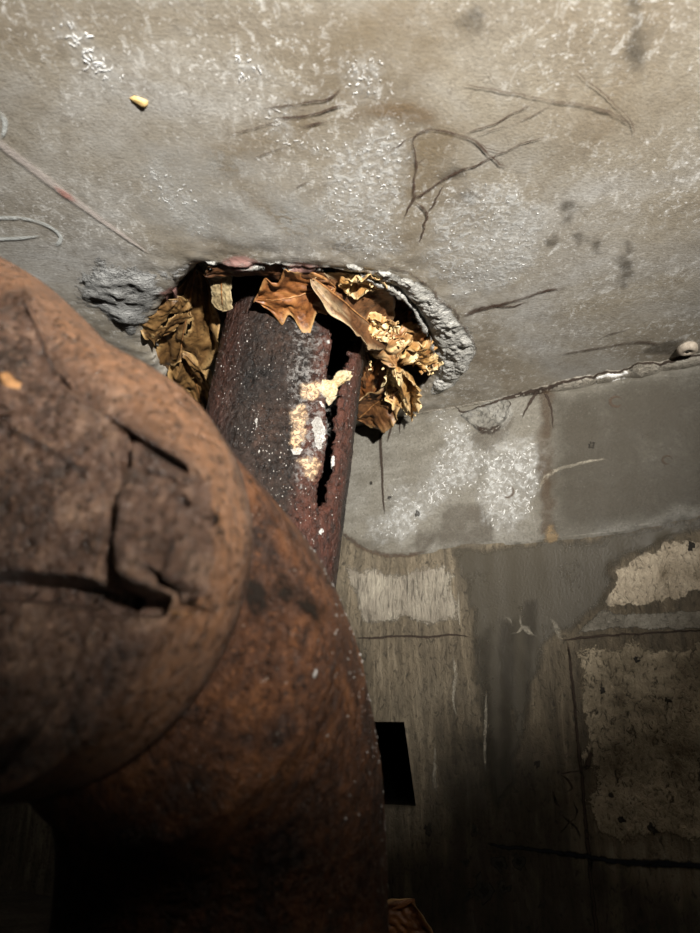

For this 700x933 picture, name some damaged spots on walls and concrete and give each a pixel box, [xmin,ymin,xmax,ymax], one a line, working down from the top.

crack [395,74,634,240]
spalling [206,256,477,394]
crack [468,288,557,315]
crack [397,333,700,425]
leakage [377,411,700,807]
peeling [605,540,700,607]
peeling [576,641,700,844]